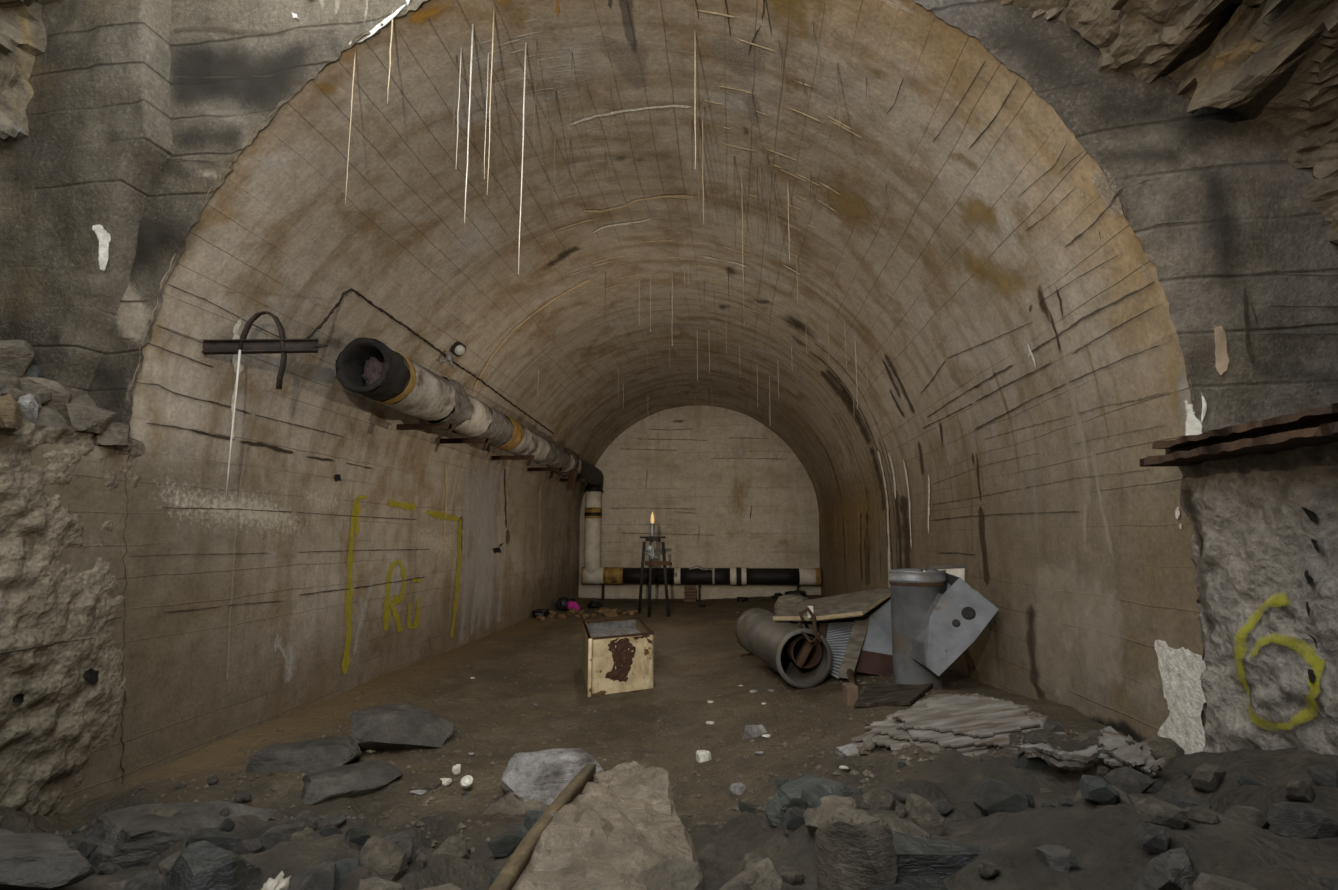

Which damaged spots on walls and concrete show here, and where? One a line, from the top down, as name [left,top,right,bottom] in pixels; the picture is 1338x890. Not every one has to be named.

crack [695,0,772,55]
crack [933,61,986,142]
crack [969,80,1018,149]
crack [1018,142,1081,231]
crack [920,180,1184,430]
peeling [1214,326,1229,375]
peeling [851,639,1206,773]